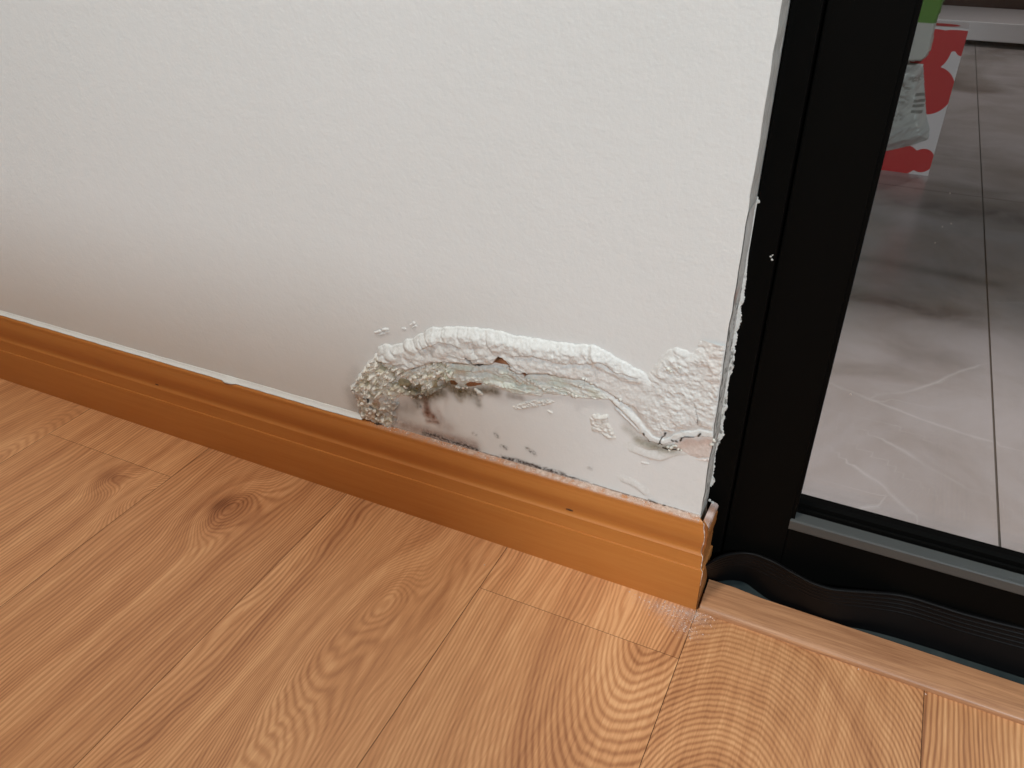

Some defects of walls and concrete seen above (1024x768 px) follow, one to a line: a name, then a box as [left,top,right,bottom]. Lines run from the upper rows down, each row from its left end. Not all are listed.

flaking render [441,357,650,442]
flaking render [662,197,760,504]